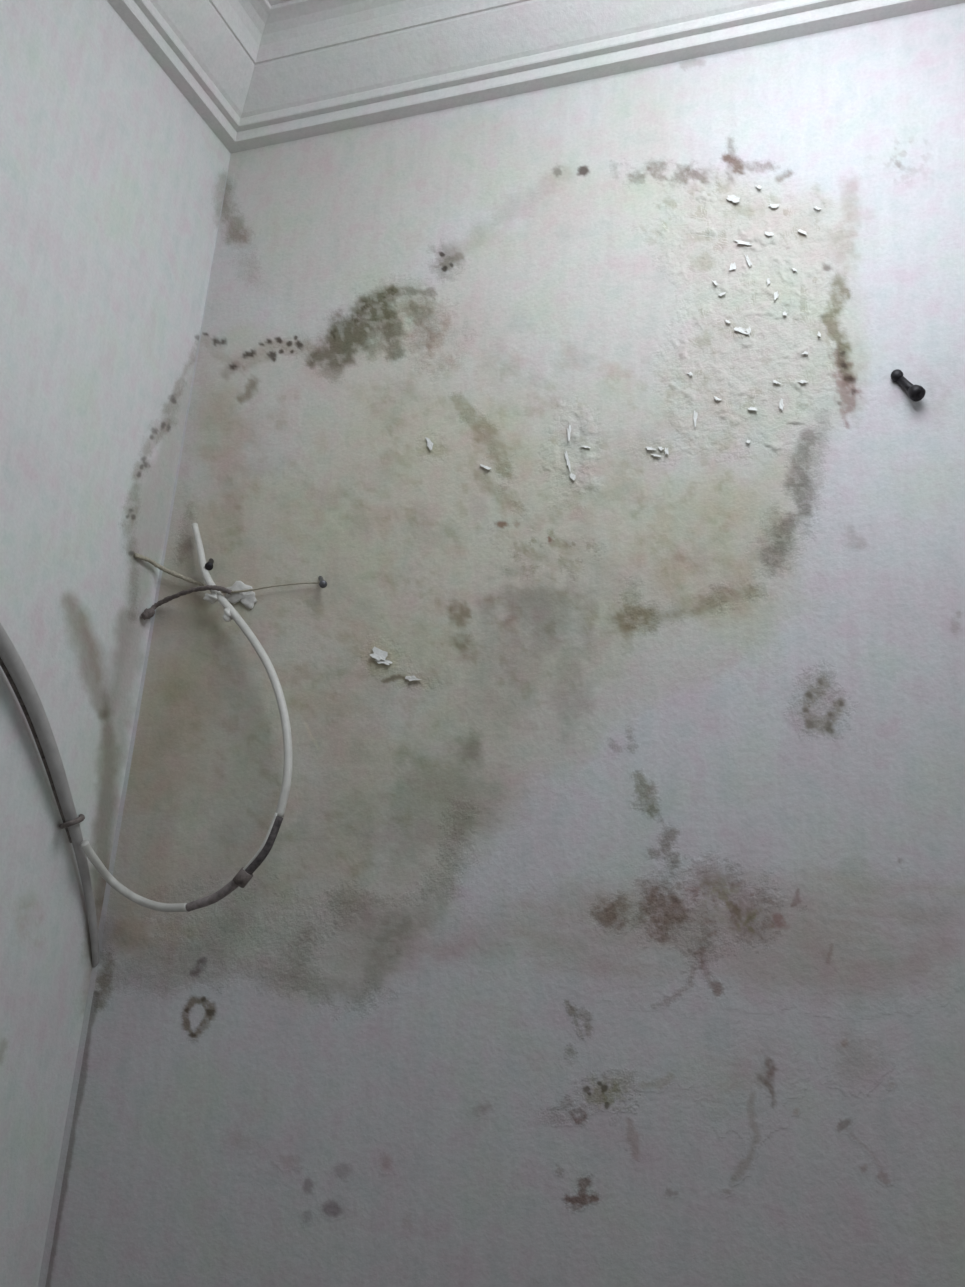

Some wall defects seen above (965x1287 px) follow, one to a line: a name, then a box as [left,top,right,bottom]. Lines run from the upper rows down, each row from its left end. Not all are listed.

damp [76,47,965,1044]
peeling [625,159,855,467]